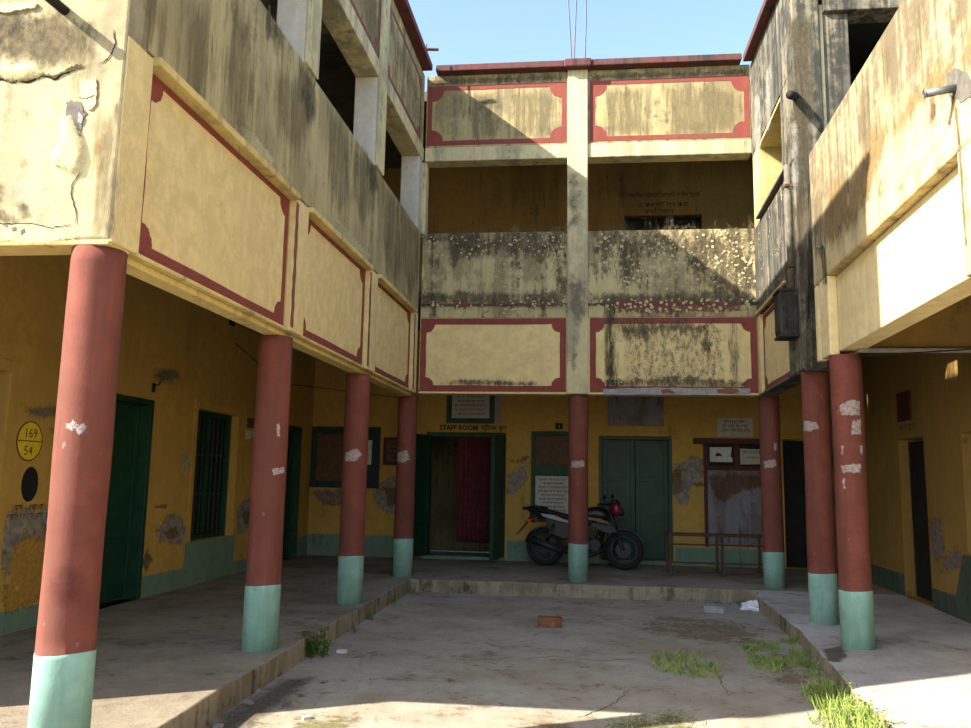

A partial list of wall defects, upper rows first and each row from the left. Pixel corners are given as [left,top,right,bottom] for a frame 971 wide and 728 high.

damp [0,12,91,68]
crack [0,29,116,83]
peeling [66,79,97,135]
damp [432,75,562,139]
damp [592,69,746,135]
damp [785,19,951,296]
crack [0,173,80,229]
damp [327,105,755,388]
peeling [672,456,704,505]
peeling [0,501,48,613]
peeling [156,513,186,546]
peeling [237,498,250,533]